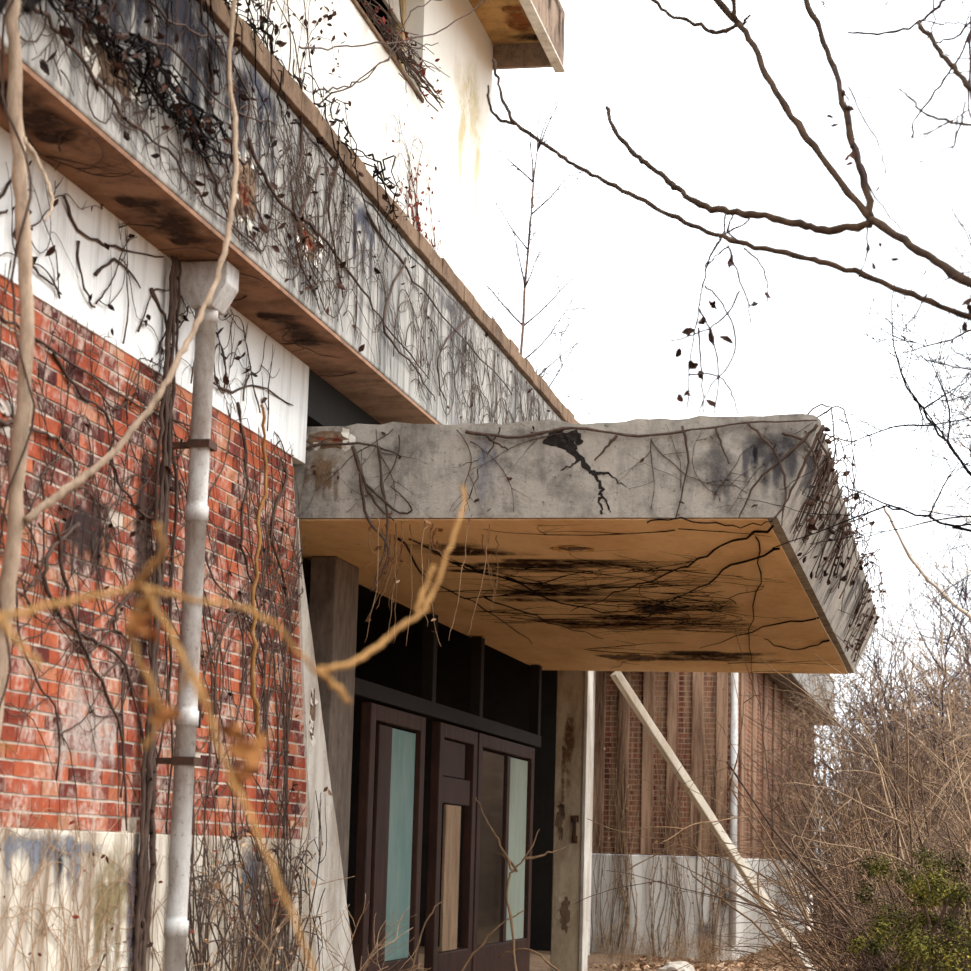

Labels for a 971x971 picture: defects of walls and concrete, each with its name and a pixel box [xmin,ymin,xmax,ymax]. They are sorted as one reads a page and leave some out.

damp [116,198,206,245]
damp [257,313,320,345]
spalling [306,427,356,451]
crack [561,451,626,515]
damp [414,544,627,573]
damp [505,584,621,602]
damp [533,616,701,629]
damp [654,651,752,661]